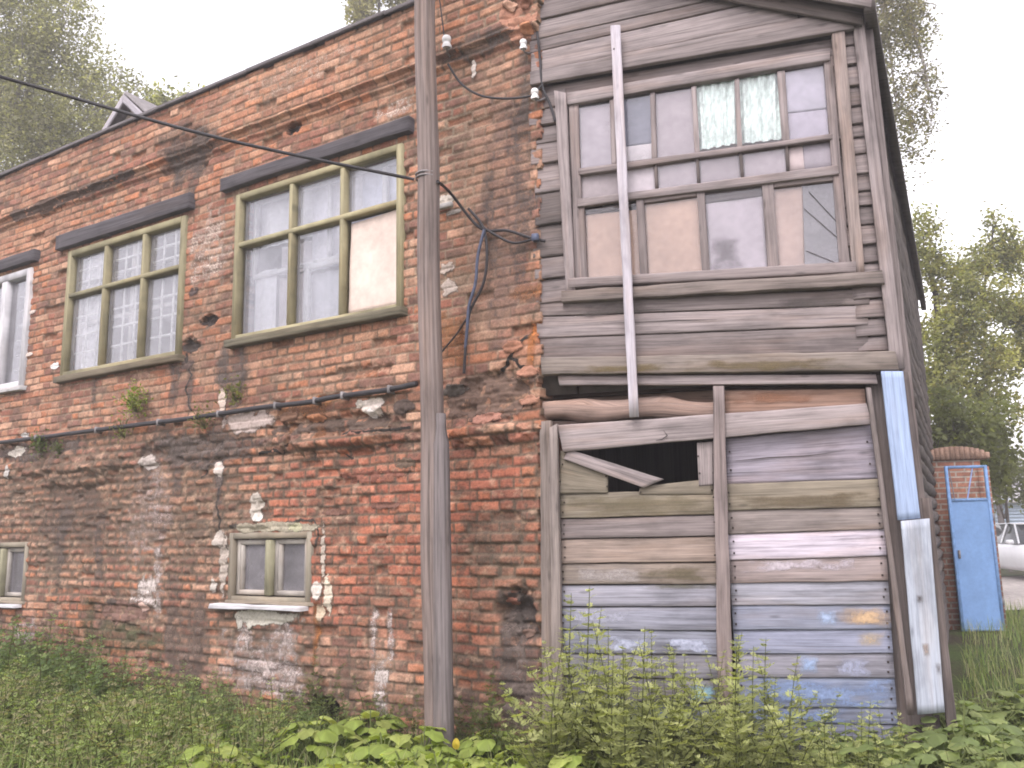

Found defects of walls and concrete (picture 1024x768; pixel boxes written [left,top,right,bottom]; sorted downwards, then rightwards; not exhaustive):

spalling [499,0,538,46]
crack [184,353,193,411]
spalling [218,388,415,438]
spalling [443,365,540,425]
crack [500,332,533,372]
damp [0,438,81,472]
crack [201,450,237,530]
damp [66,425,262,688]
peeling [210,492,347,621]
crack [286,518,319,546]
damp [222,623,303,701]
damp [493,594,542,729]